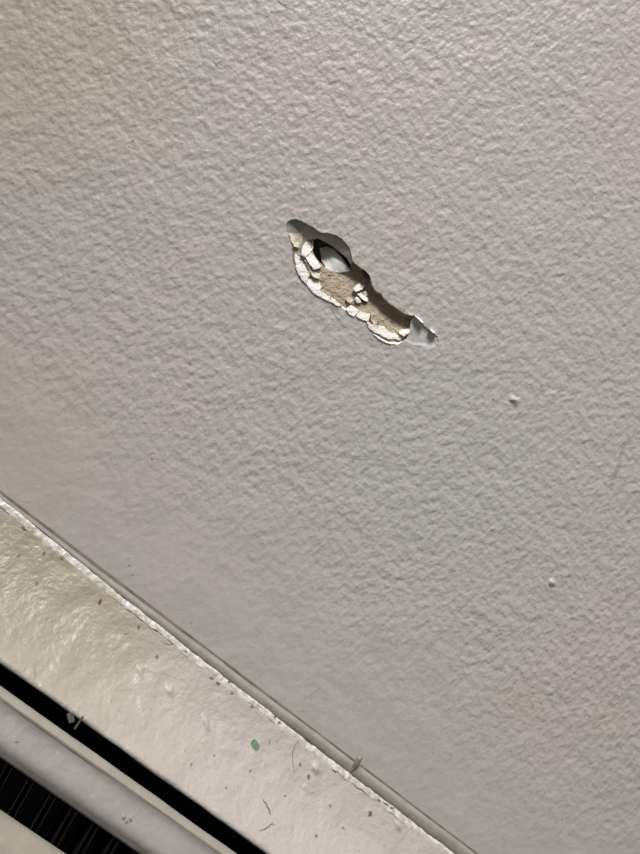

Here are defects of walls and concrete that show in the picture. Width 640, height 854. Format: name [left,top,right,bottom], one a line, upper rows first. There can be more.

spalling [286,219,439,349]